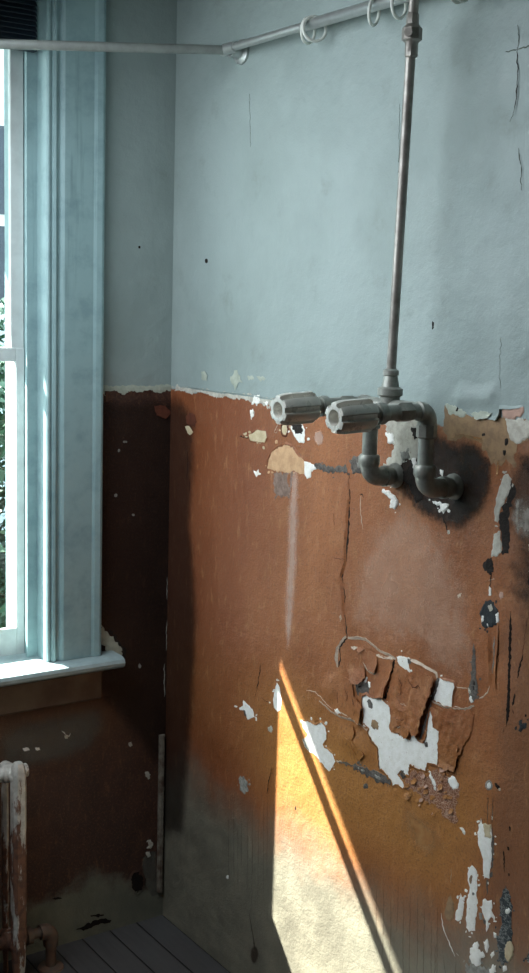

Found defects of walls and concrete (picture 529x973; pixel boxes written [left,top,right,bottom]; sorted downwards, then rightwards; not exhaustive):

crack [506,25,529,118]
spalling [103,370,316,500]
crack [333,475,396,667]
spalling [382,420,450,514]
damp [401,435,490,527]
peeling [442,403,529,633]
damp [511,457,529,602]
peeling [234,700,257,721]
spalling [300,717,337,772]
spalling [337,644,529,973]